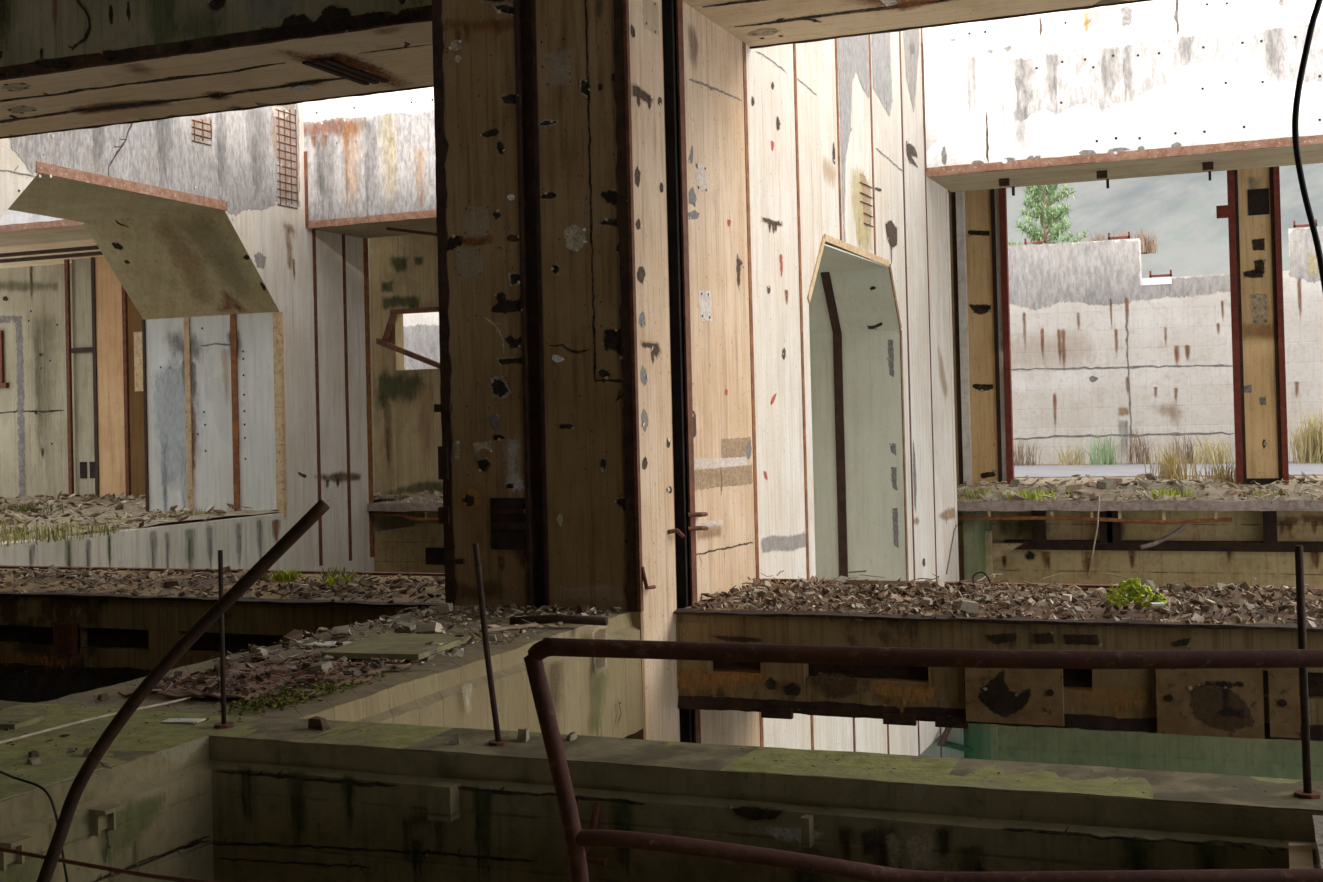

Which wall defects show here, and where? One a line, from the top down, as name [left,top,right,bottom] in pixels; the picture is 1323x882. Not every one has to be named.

spalling [1084,5,1135,29]
corrosion [285,52,403,87]
peeling [986,21,1323,122]
peeling [10,92,436,221]
corrosion [305,120,353,145]
spalling [1079,146,1144,155]
corrosion [1041,315,1079,363]
corrosion [1110,298,1129,352]
spalling [978,670,1031,718]
spalling [1188,680,1255,731]
crack [93,829,536,882]